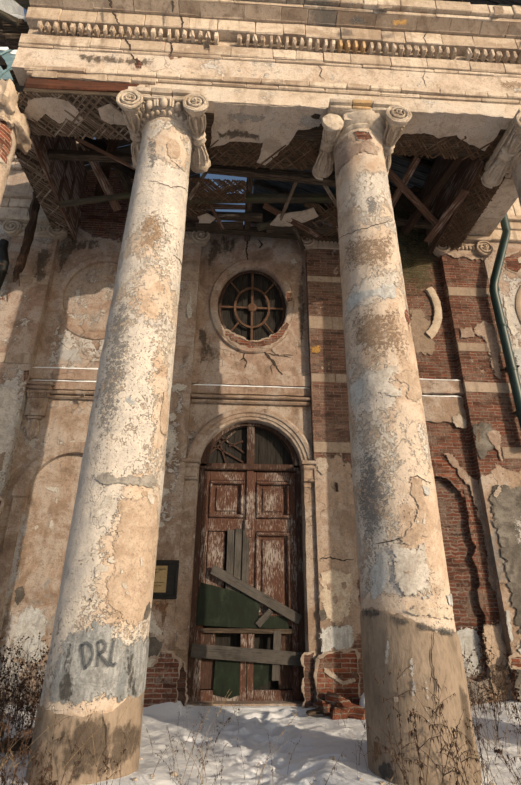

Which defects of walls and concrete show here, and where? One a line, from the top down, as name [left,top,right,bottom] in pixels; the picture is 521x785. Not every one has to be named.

crack [108,0,138,62]
flaking render [0,121,12,168]
flaking render [504,251,521,274]
crack [264,352,291,374]
peeling [346,283,435,405]
flaking render [460,321,502,379]
peeling [503,296,519,336]
peeling [0,386,20,521]
peeling [49,466,189,707]
peeling [12,586,48,663]